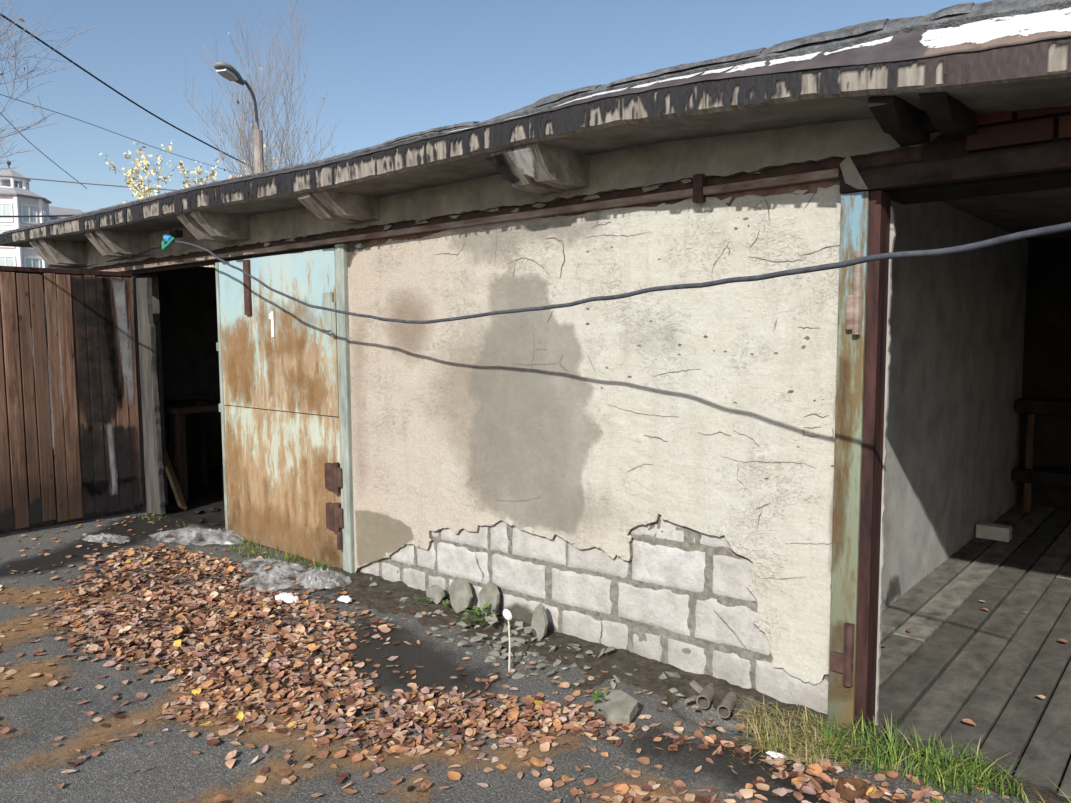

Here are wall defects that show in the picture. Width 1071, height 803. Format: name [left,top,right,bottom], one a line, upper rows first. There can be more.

peeling [919,7,1071,55]
peeling [506,36,893,120]
flaking render [81,179,693,271]
crack [494,212,647,277]
crack [712,197,840,271]
rust [265,304,306,391]
water stain [473,279,591,530]
crack [803,413,834,438]
rust [839,363,847,422]
crack [701,430,815,523]
rust [833,482,843,550]
flaking render [360,514,829,714]